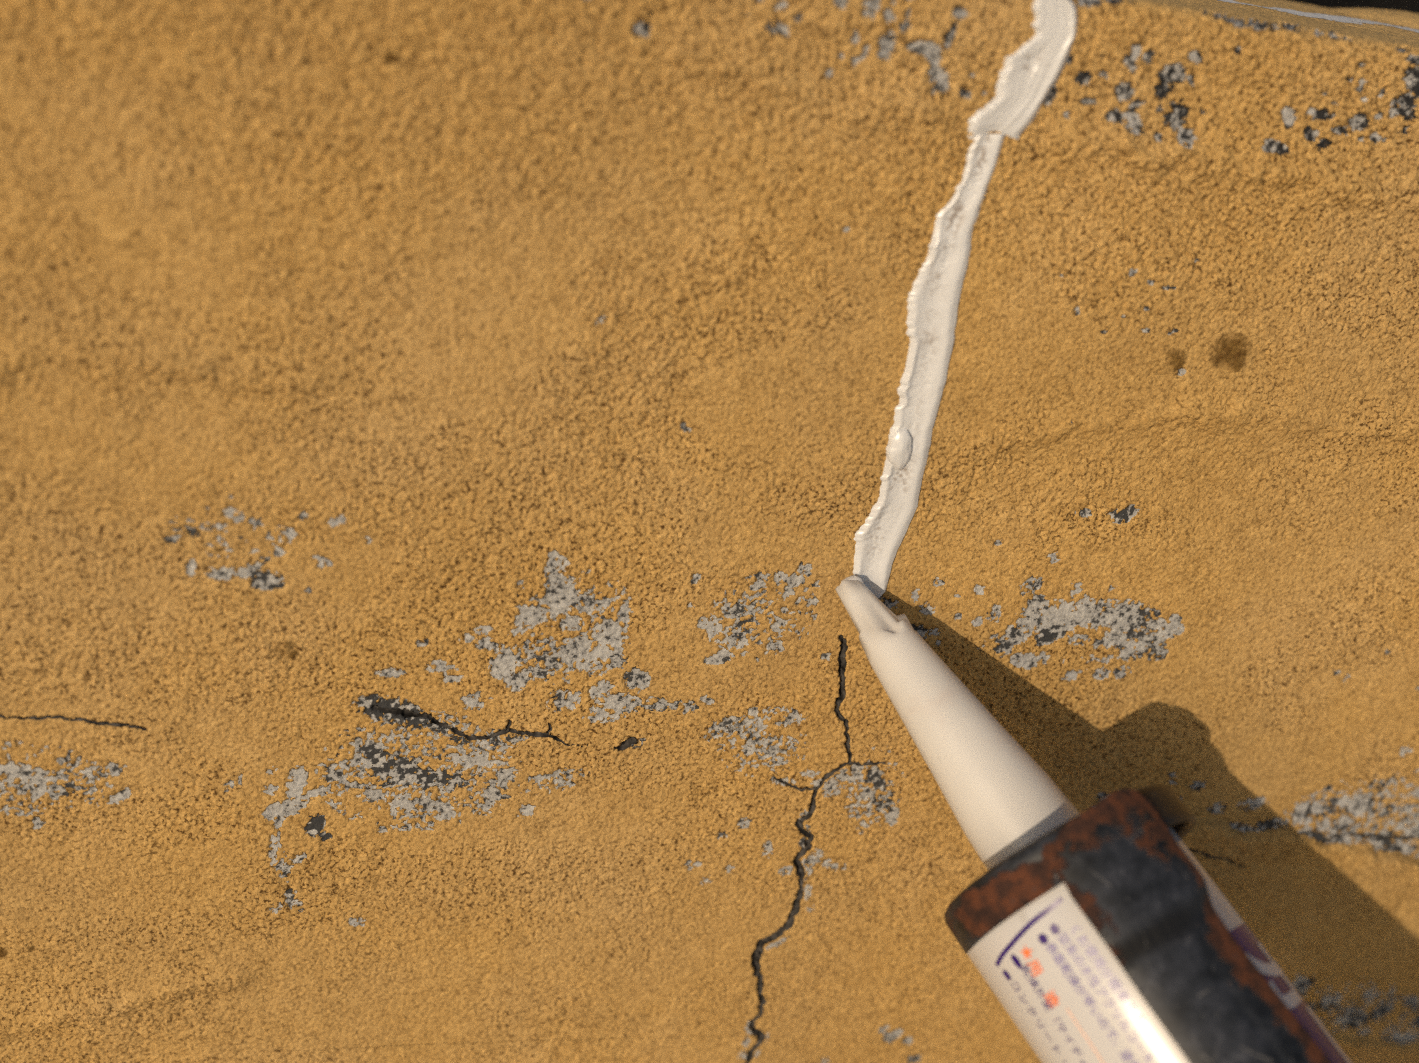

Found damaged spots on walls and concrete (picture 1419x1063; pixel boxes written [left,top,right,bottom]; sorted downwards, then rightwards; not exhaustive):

flaking render [1202,10,1353,41]
flaking render [1043,43,1206,149]
flaking render [1261,46,1419,158]
flaking render [1075,504,1140,524]
flaking render [0,740,131,830]
crack [0,715,146,731]
flaking render [261,639,596,914]
crack [373,705,645,751]
flaking render [459,550,820,786]
crack [738,635,886,1063]
flaking render [879,551,1185,681]
flaking render [1207,746,1419,858]